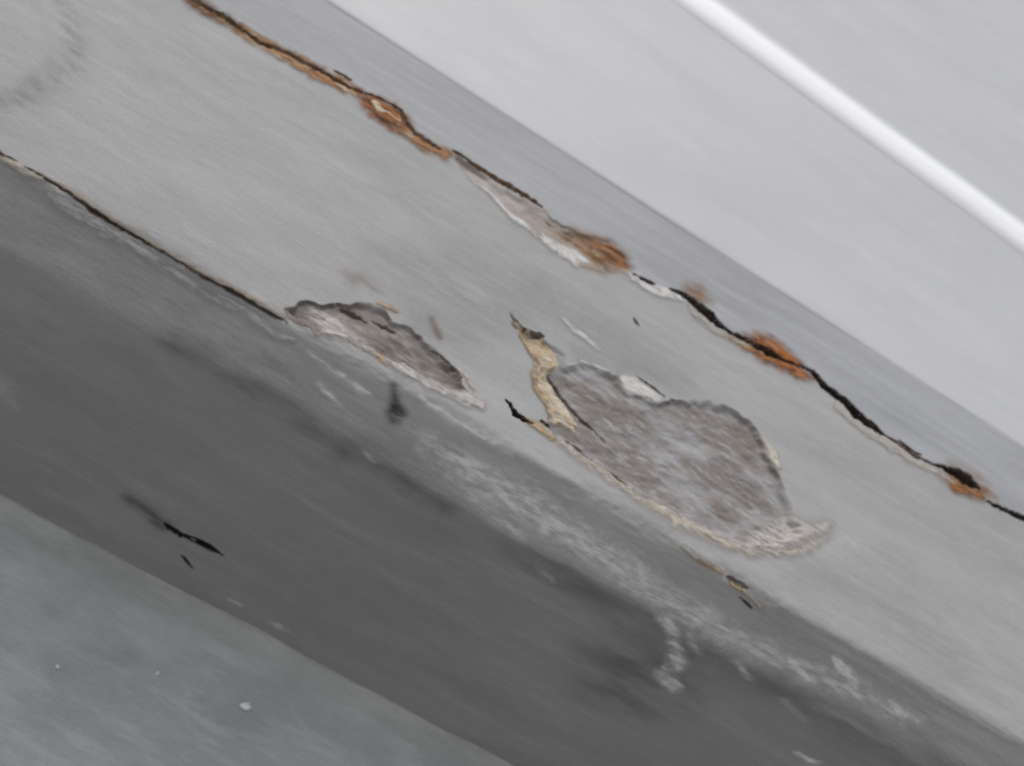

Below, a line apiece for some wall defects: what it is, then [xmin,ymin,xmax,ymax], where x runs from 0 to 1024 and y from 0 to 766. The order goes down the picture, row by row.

corrosion [185,0,452,159]
crack [190,0,543,208]
crack [0,152,296,341]
spalling [441,148,748,346]
corrosion [561,233,629,270]
crack [163,522,224,569]
spalling [284,300,486,410]
crack [505,399,557,440]
spalling [510,312,832,557]
corrosion [727,333,813,379]
crack [633,274,1024,522]
corrosion [947,478,986,500]